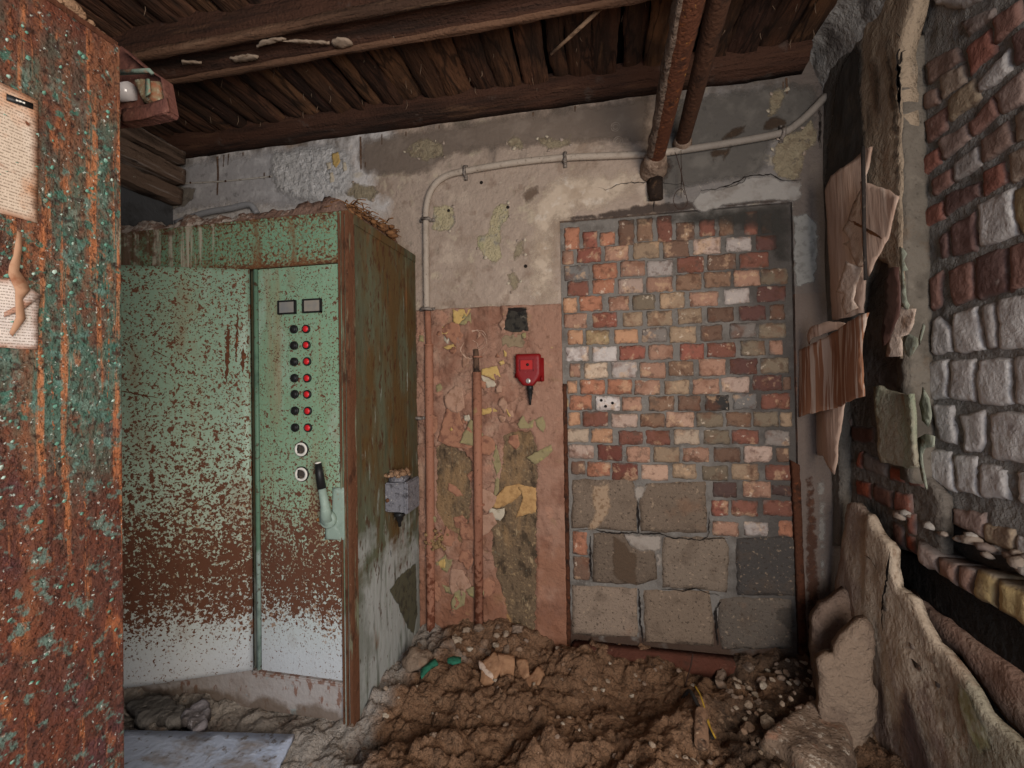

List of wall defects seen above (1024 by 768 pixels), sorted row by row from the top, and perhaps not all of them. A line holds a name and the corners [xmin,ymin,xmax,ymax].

flaking render [431,205,456,233]
crack [599,174,796,209]
peeling [416,237,567,646]
flaking render [793,147,1024,768]
crack [573,488,724,578]
crack [638,588,721,643]